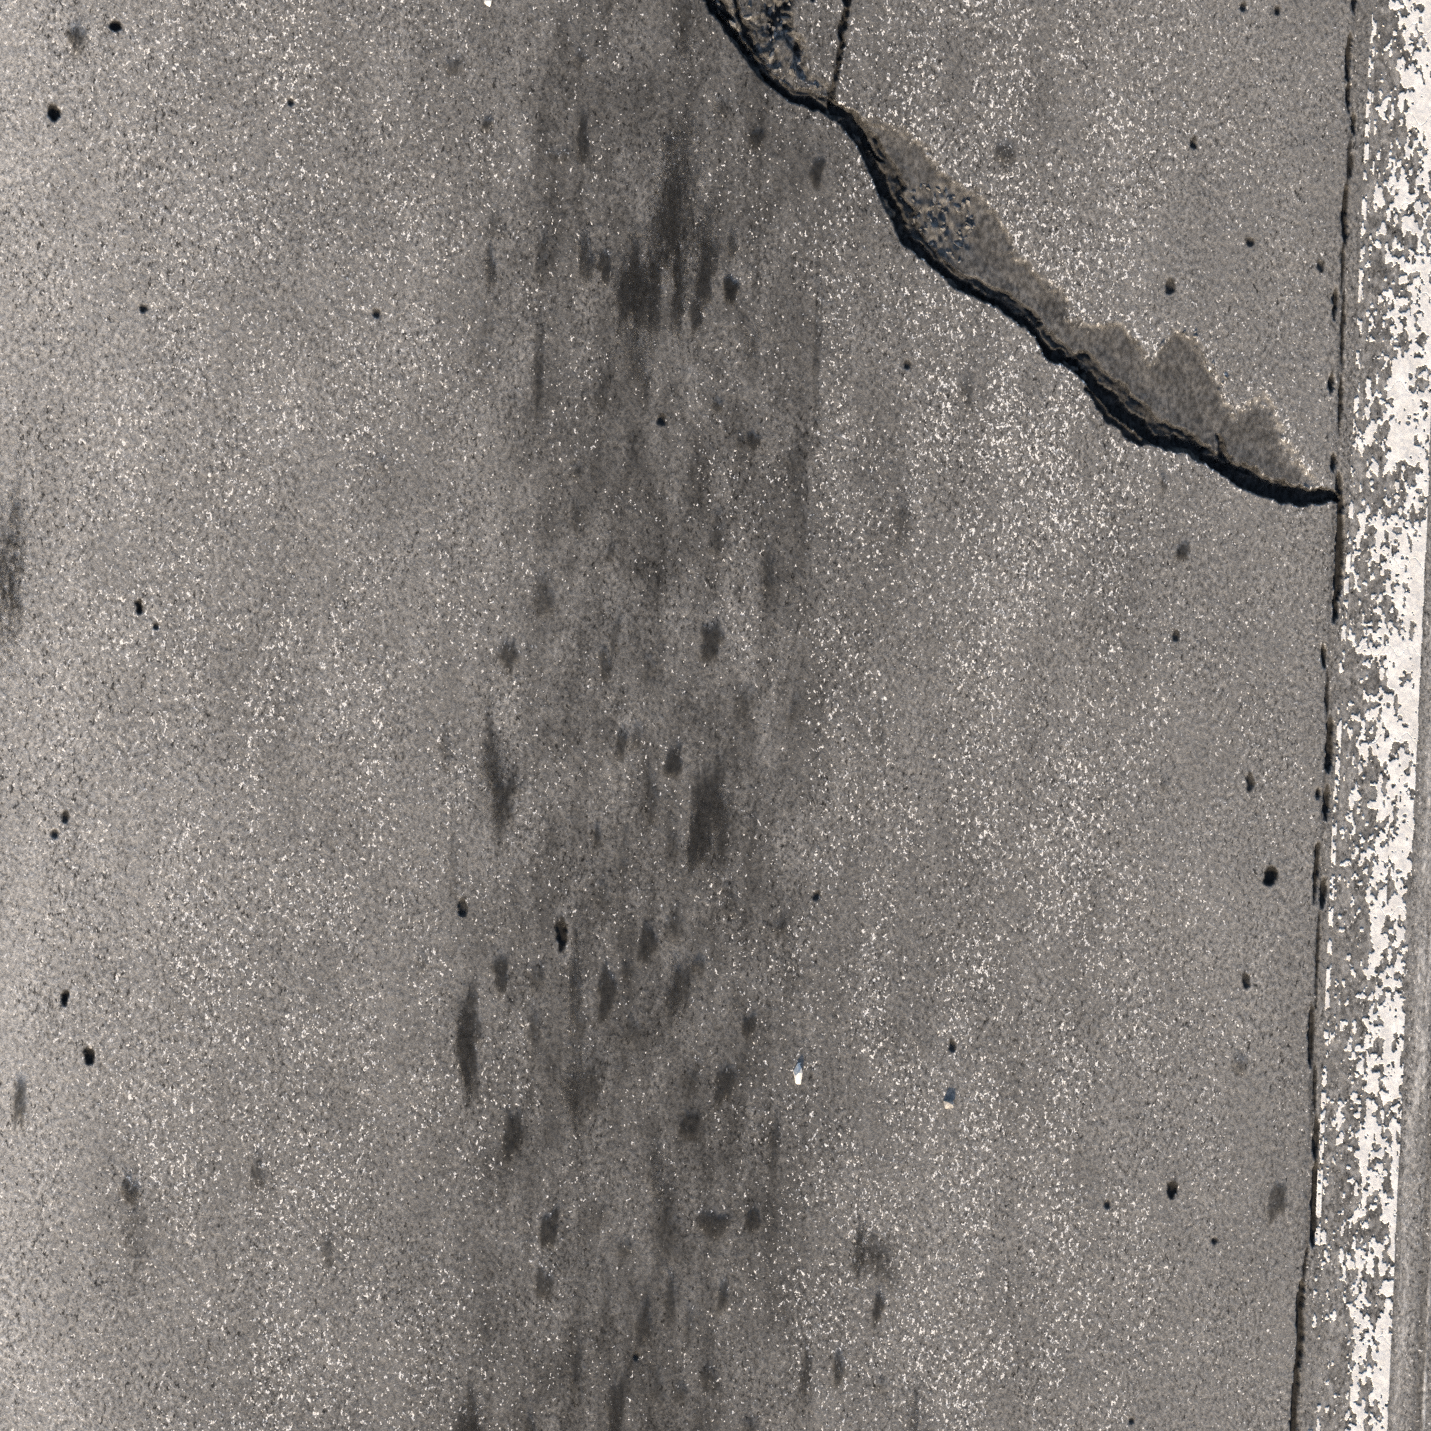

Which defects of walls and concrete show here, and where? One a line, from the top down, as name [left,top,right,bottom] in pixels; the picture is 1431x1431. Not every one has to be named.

spalling [713,0,829,97]
damp [617,183,701,331]
spalling [864,119,1297,484]
crack [705,0,1356,1431]
peeling [1315,0,1431,1431]
damp [688,816,728,869]
damp [457,1029,471,1088]
damp [855,1232,864,1277]
damp [873,1296,884,1323]
damp [801,1360,810,1393]